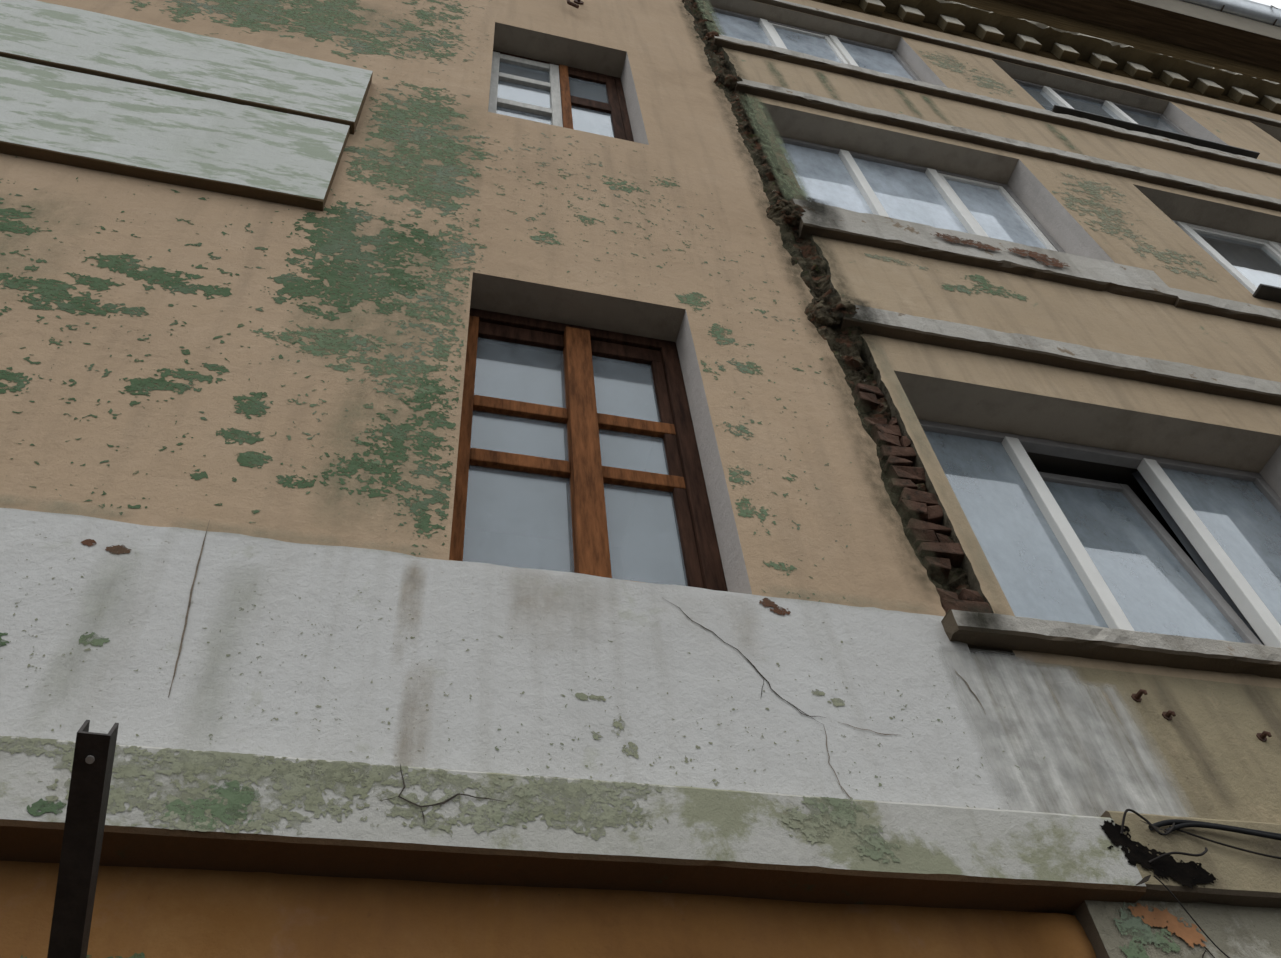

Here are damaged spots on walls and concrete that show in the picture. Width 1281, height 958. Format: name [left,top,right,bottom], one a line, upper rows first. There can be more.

peeling [931,232,1070,268]
peeling [0,0,991,615]
peeling [0,618,45,687]
peeling [63,632,110,671]
crack [662,597,898,799]
peeling [0,725,75,816]
peeling [106,657,810,840]
peeling [1114,902,1210,958]